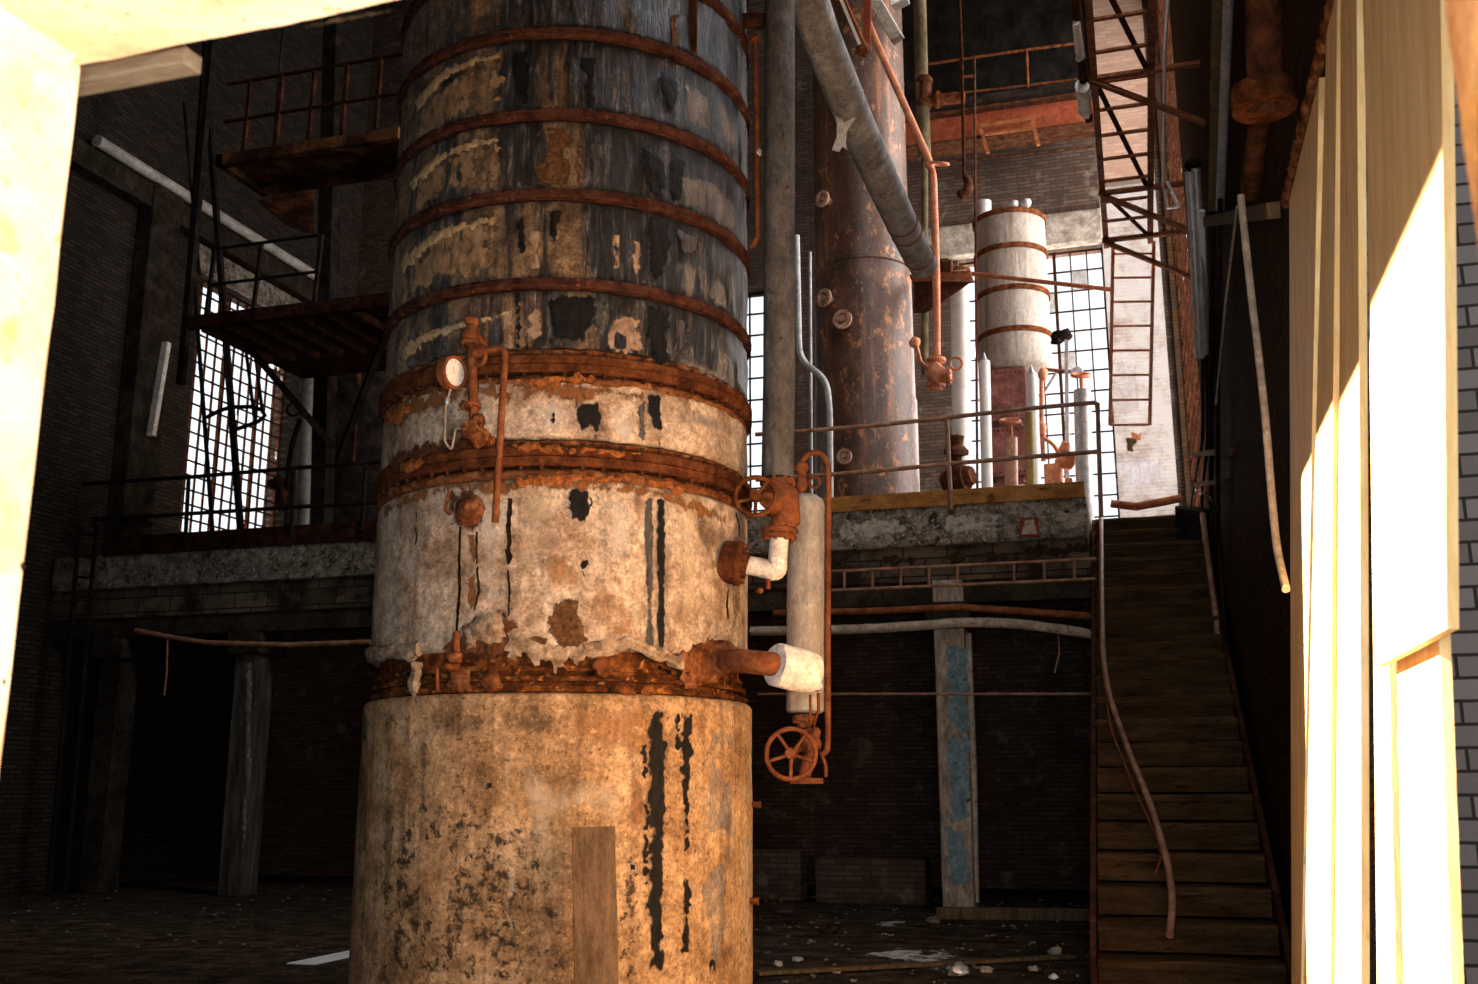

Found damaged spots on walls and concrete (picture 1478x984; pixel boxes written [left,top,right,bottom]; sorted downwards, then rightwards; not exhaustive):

peeling [413,53,506,138]
peeling [612,235,641,274]
peeling [402,294,597,360]
peeling [607,316,643,355]
rust [380,434,744,479]
rust [376,468,750,658]
peeling [449,611,506,693]
peeling [529,598,588,648]
peeling [676,637,725,689]
damp [361,787,607,984]
damp [620,711,725,983]
damp [709,738,752,932]